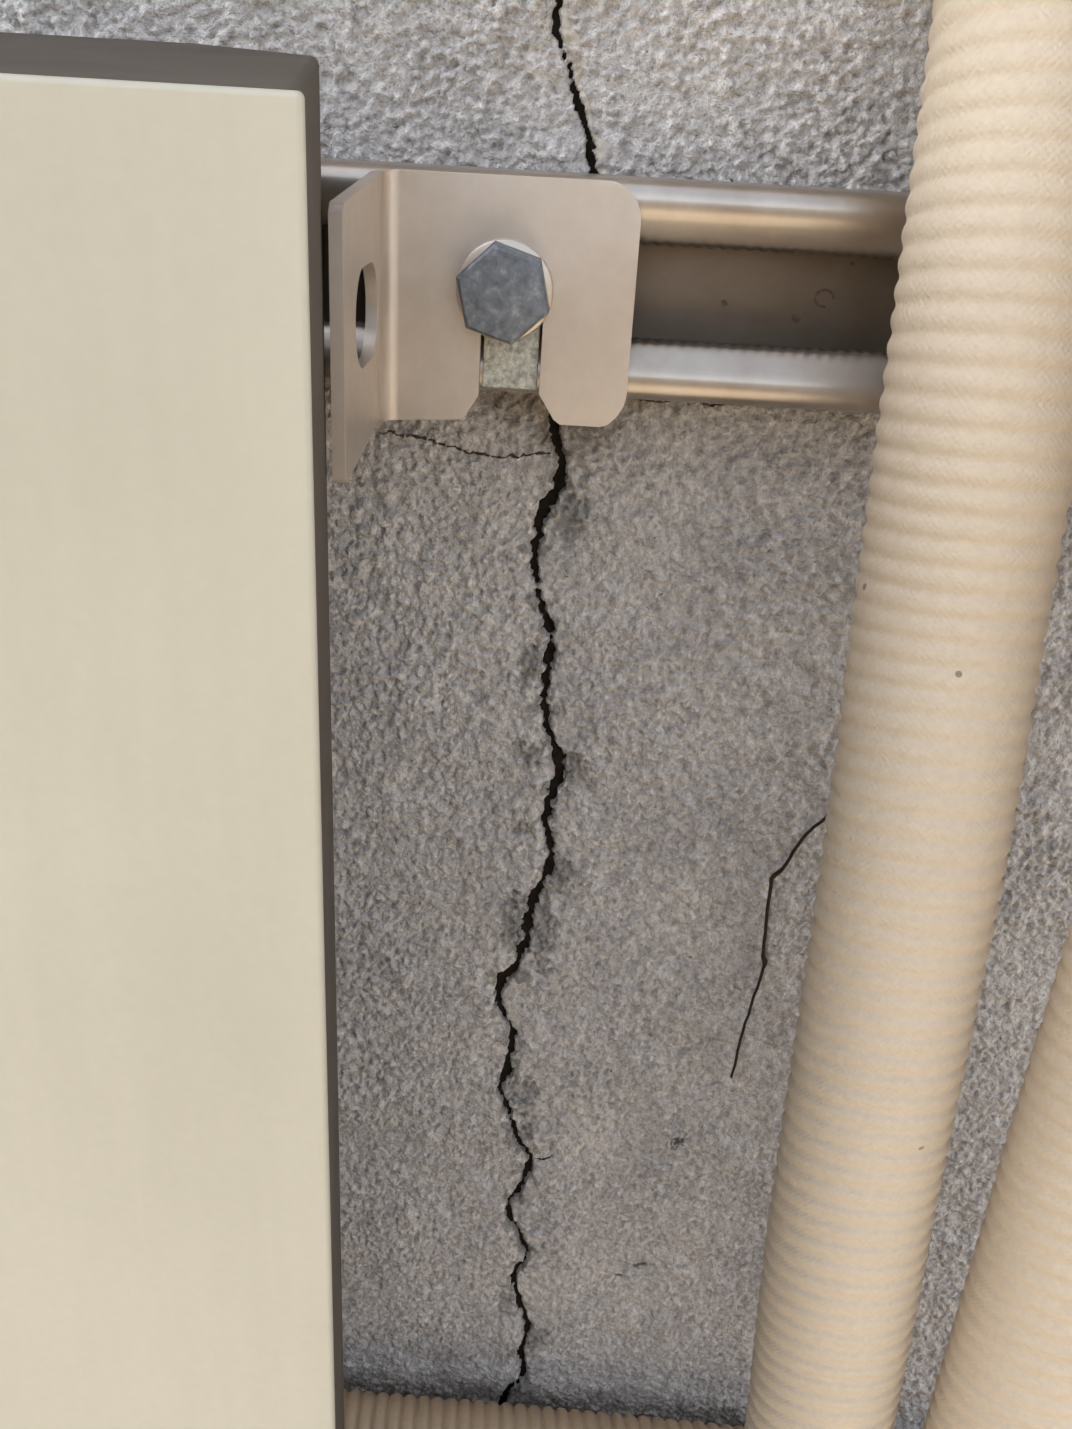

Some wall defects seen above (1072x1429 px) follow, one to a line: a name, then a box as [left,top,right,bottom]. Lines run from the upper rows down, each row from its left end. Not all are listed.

crack [551,0,611,175]
crack [638,399,726,407]
crack [379,413,567,1405]